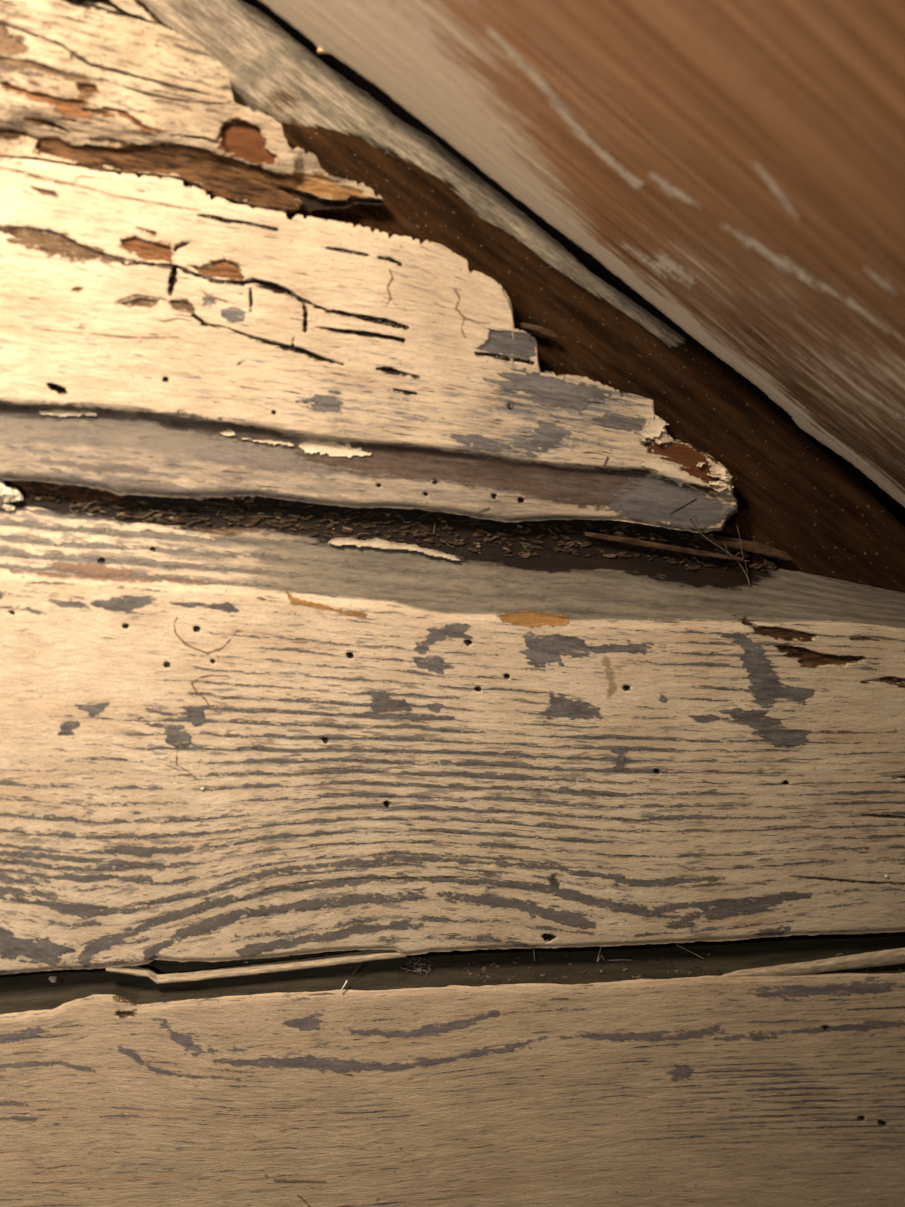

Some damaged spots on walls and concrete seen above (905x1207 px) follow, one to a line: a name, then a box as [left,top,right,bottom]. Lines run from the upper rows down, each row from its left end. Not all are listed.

peeling [115,293,246,323]
peeling [295,390,343,412]
peeling [449,329,669,457]
peeling [607,455,738,535]
peeling [328,538,459,560]
peeling [413,623,473,674]
peeling [497,611,653,668]
peeling [689,632,815,748]
peeling [352,691,455,721]
peeling [540,691,603,722]
peeling [611,749,630,771]